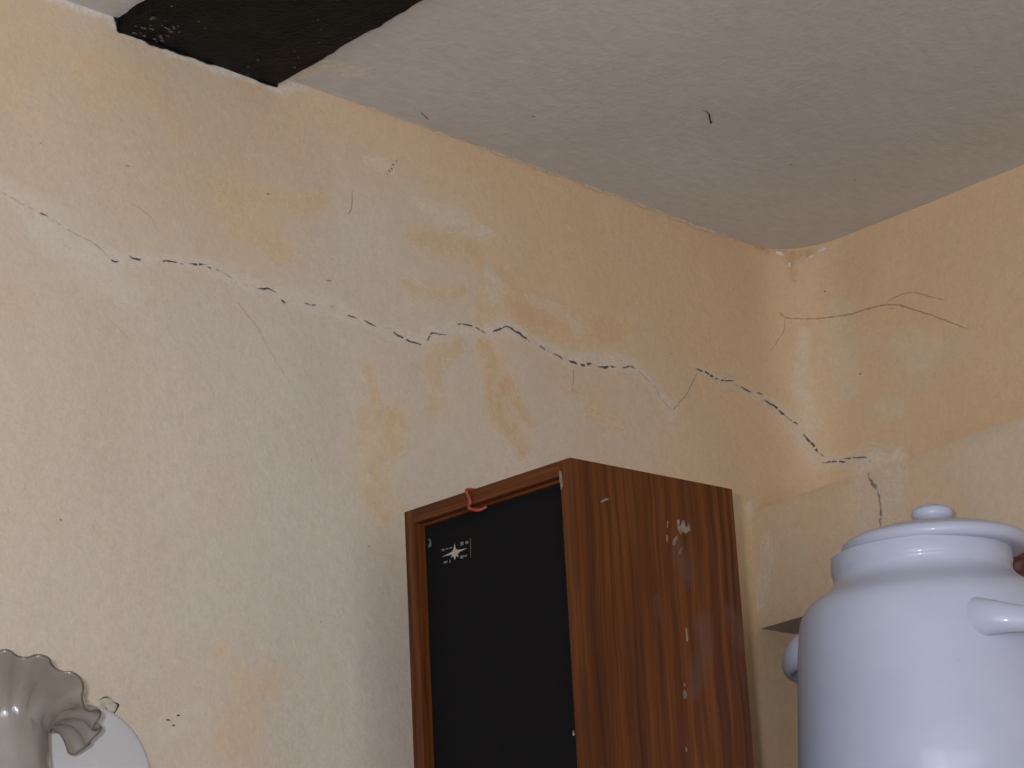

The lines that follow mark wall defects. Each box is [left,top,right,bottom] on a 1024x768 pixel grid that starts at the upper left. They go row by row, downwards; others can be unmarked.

crack [2,192,232,278]
crack [770,292,967,351]
crack [258,287,882,527]